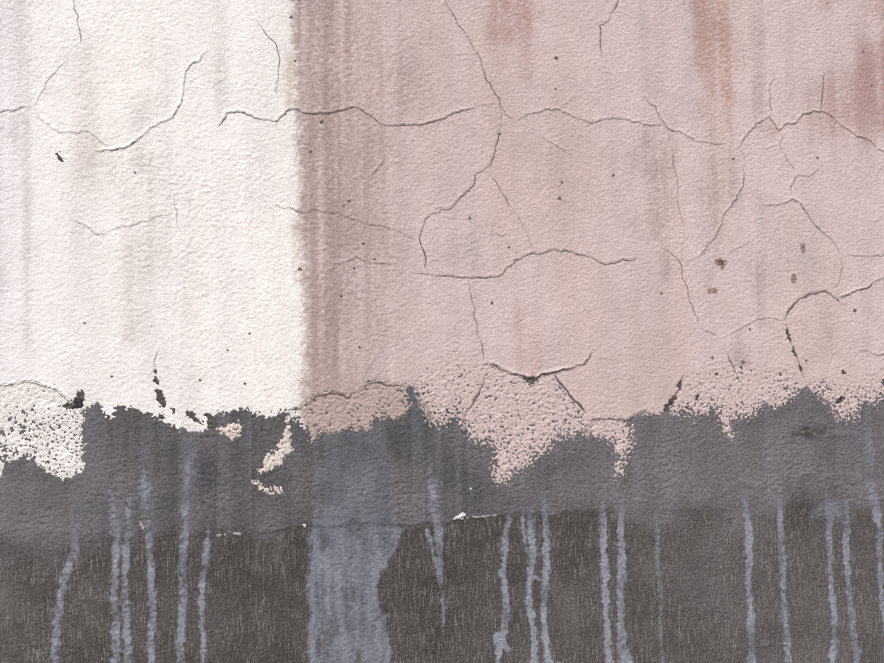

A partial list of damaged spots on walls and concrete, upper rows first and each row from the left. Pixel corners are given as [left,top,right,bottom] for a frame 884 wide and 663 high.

crack [218,107,471,127]
crack [419,73,635,278]
crack [786,278,883,336]
spalling [0,380,87,482]
spalling [152,369,217,429]
spalling [285,350,653,487]
crack [551,352,682,422]
spalling [663,329,884,441]
damp [108,470,157,663]
damp [306,515,402,663]
damp [493,501,560,663]
damp [599,495,633,663]